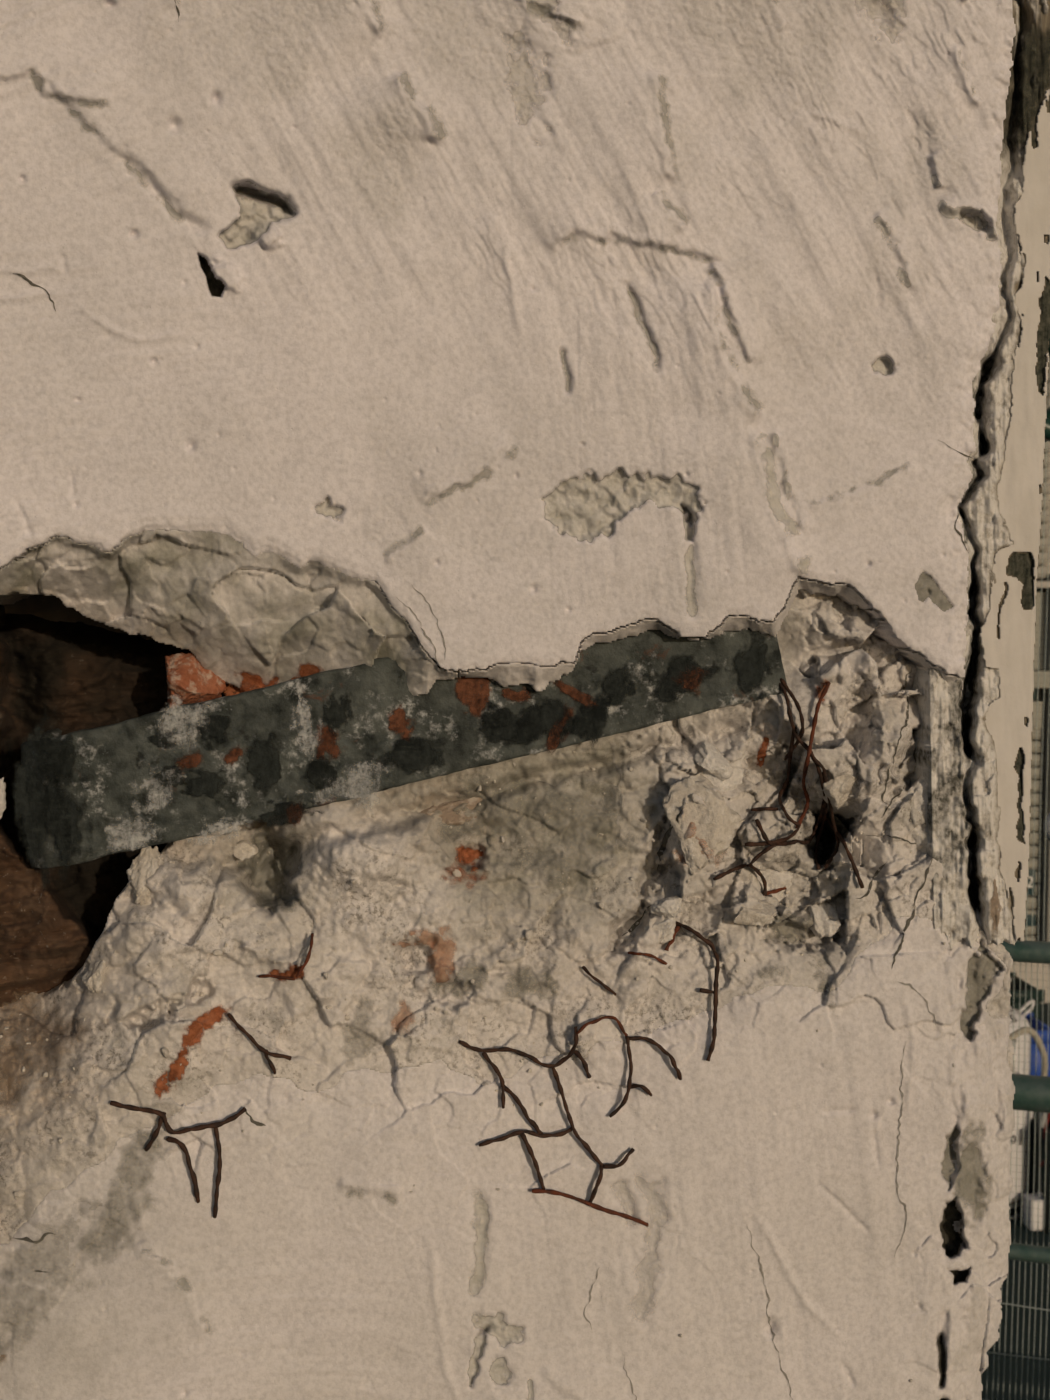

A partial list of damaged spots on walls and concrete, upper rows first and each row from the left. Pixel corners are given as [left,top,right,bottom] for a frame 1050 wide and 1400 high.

spalling [219,181,295,249]
spalling [543,468,701,616]
spalling [0,530,888,696]
spalling [915,572,953,612]
rust [225,663,320,696]
rust [388,705,414,740]
rust [455,676,532,717]
rust [757,737,769,767]
spalling [960,946,1001,1040]
spalling [942,1126,991,1219]
crack [584,1268,599,1330]
crack [937,1334,946,1388]